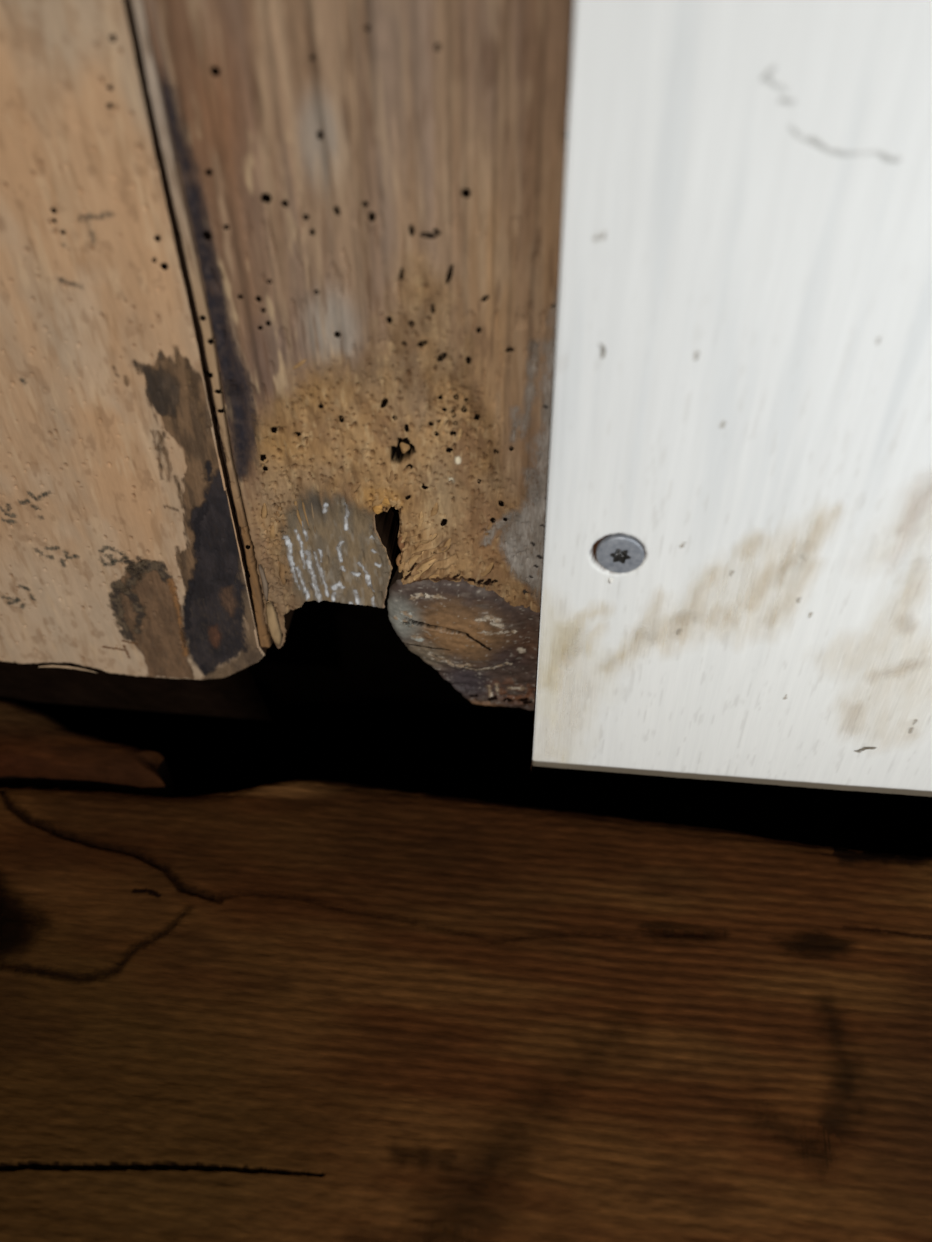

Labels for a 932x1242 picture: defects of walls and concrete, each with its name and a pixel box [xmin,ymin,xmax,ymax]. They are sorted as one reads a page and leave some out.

water stain [162,87,257,480]
spalling [372,438,416,514]
water stain [183,461,263,680]
peeling [258,564,282,646]
peeling [396,503,439,585]
crack [0,790,221,981]
crack [0,1162,324,1177]